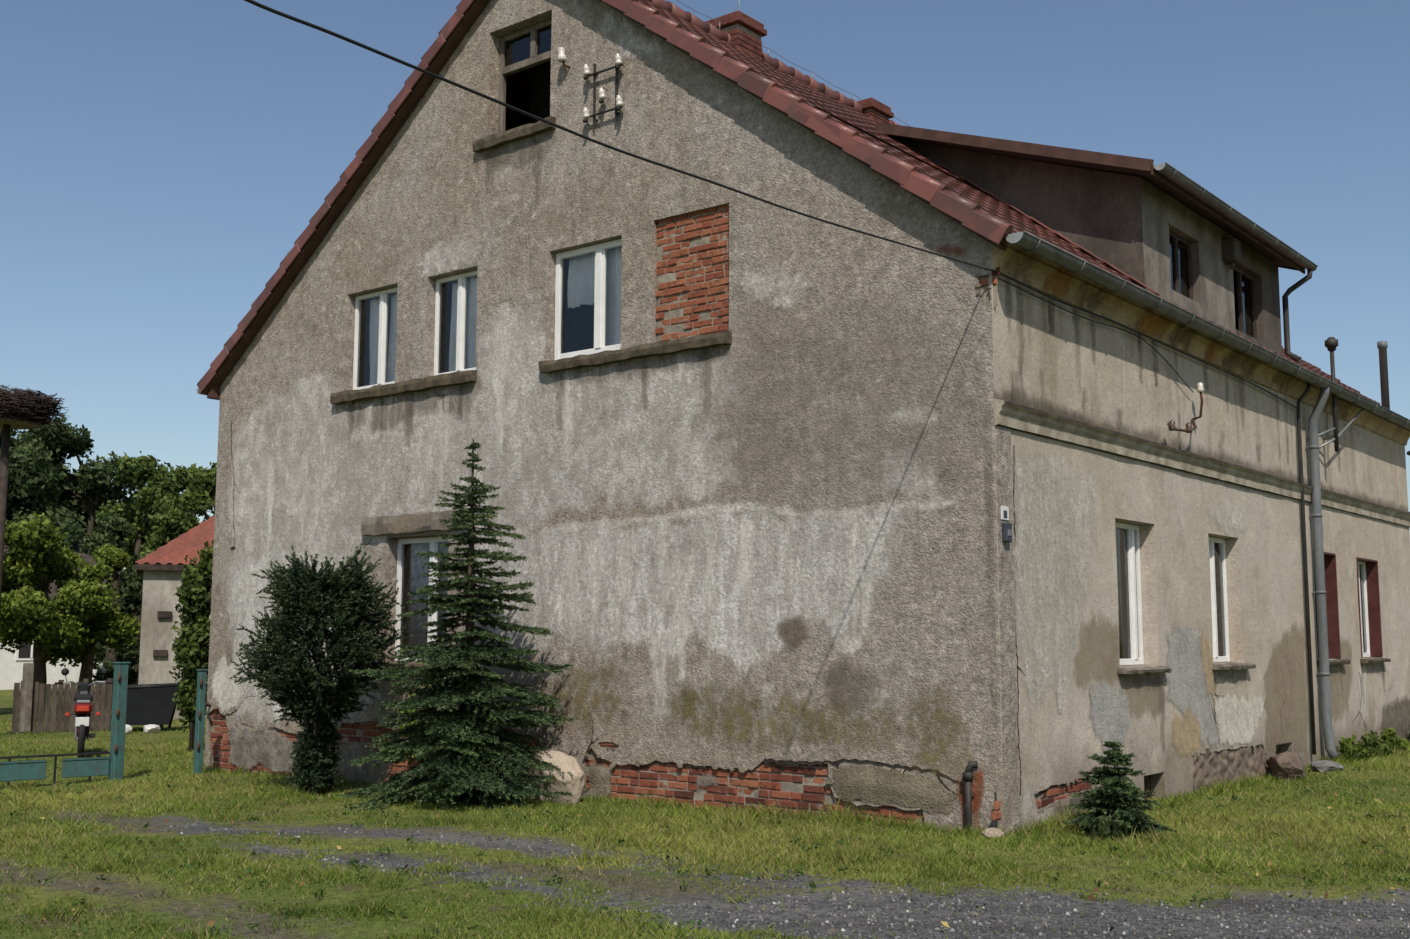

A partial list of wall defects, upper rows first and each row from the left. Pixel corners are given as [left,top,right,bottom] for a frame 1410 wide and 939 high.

peeling [207,303,937,784]
leakage [857,522,878,644]
leakage [778,618,804,644]
leakage [652,637,669,716]
flaking render [584,742,925,827]
crack [763,758,964,802]
flaking render [991,777,1089,828]